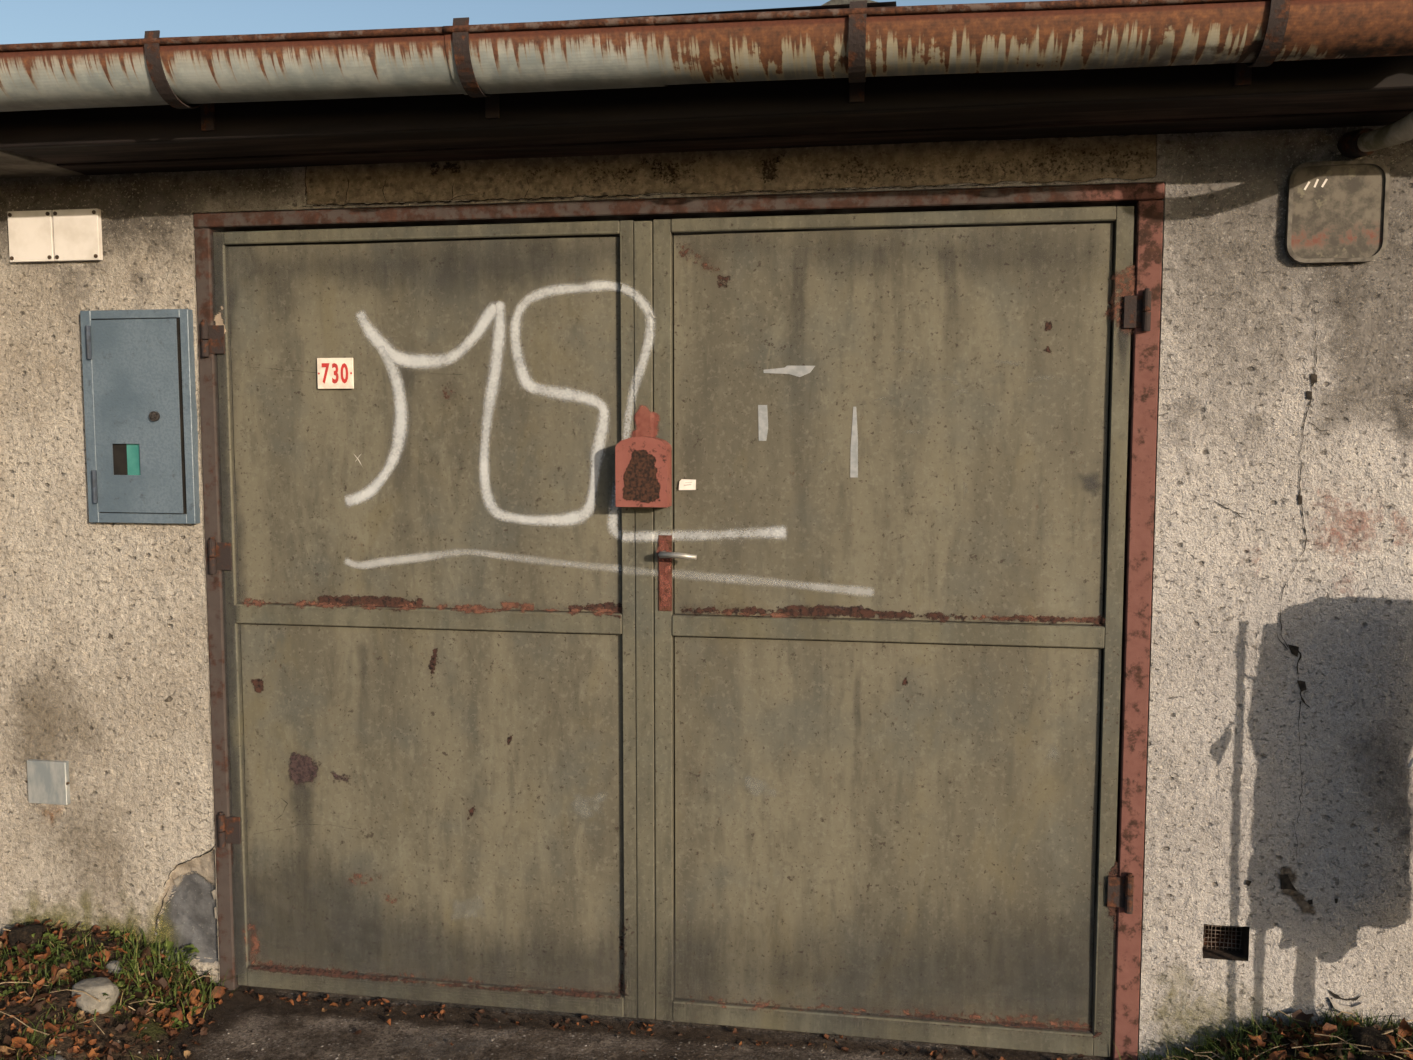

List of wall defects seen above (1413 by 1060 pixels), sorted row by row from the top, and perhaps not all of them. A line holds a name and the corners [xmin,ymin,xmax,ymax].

water stain [1167,136,1305,304]
corrosion [1105,266,1136,352]
water stain [1318,130,1413,431]
corrosion [622,450,661,503]
corrosion [243,595,622,619]
corrosion [681,604,1106,626]
crack [1276,298,1336,858]
corrosion [288,752,350,784]
spalling [153,845,219,963]
spalling [1279,867,1316,915]